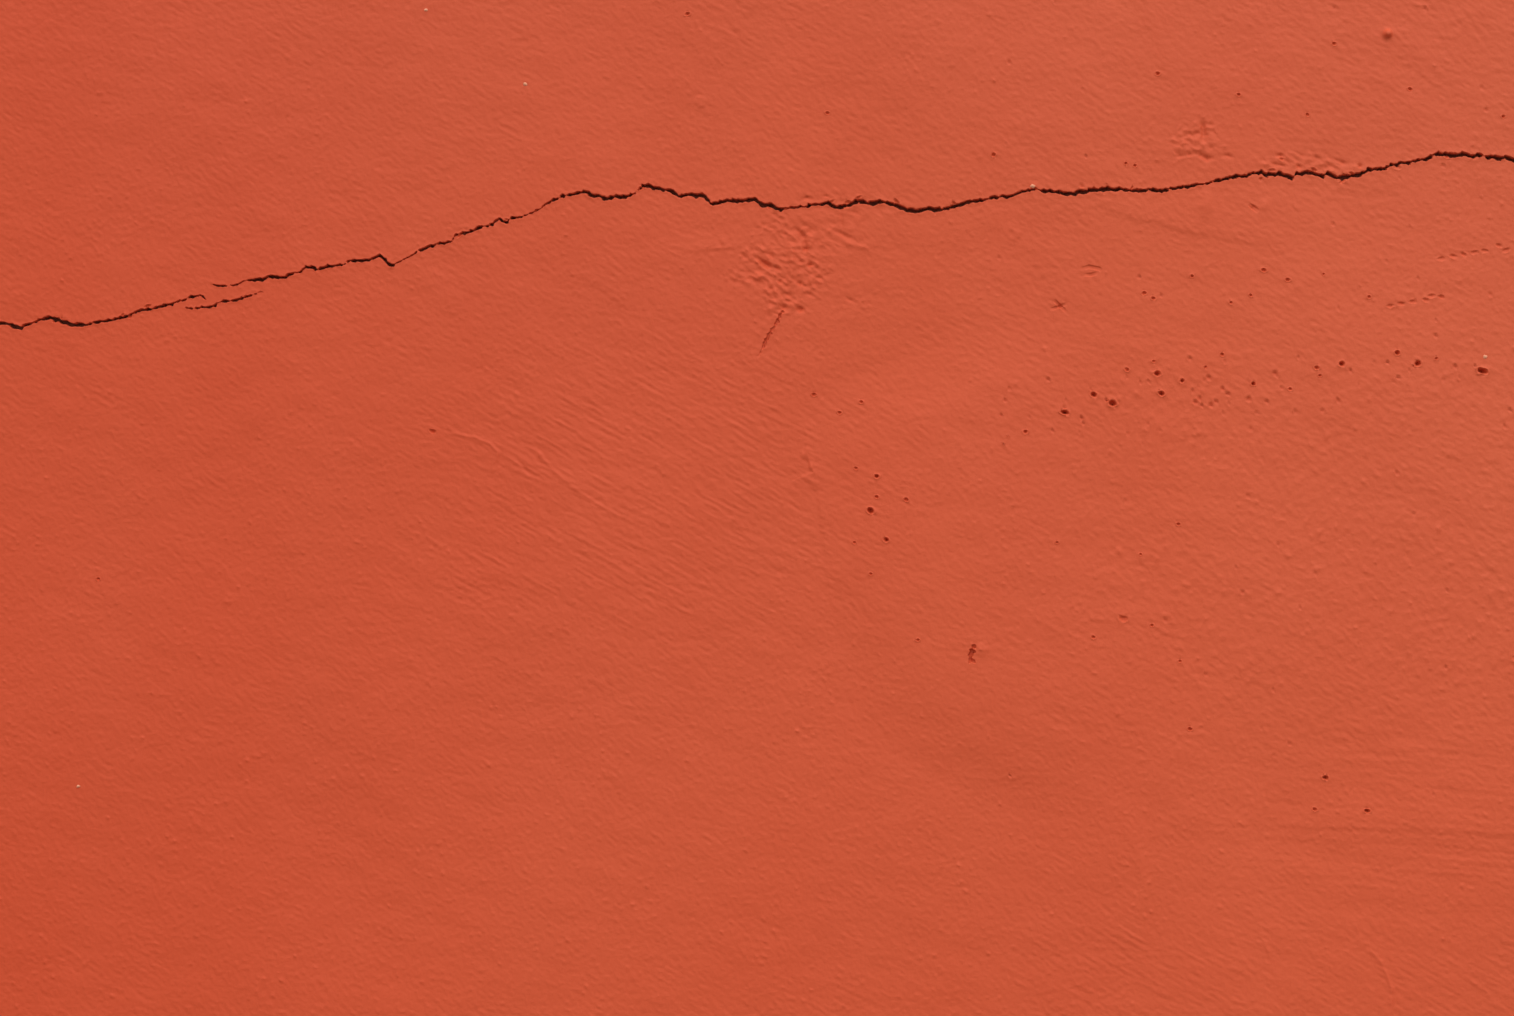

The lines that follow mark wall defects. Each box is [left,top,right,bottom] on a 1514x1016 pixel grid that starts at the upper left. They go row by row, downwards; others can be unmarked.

crack [0,148,1514,333]